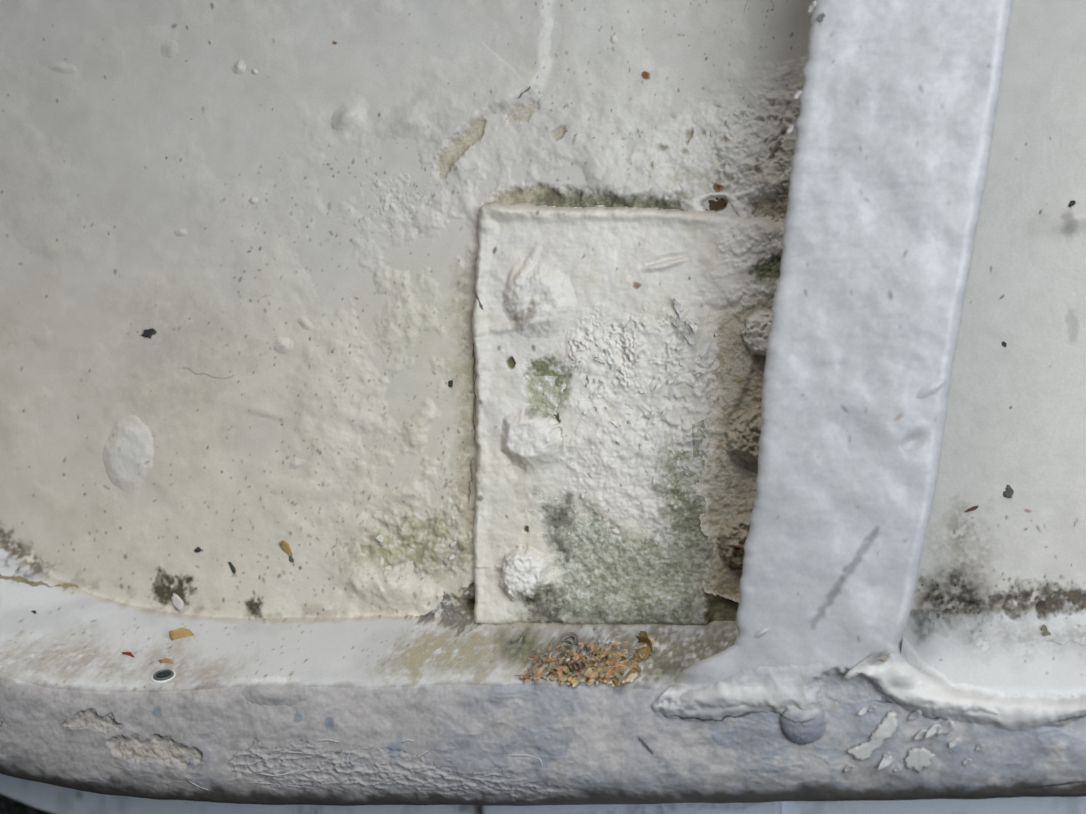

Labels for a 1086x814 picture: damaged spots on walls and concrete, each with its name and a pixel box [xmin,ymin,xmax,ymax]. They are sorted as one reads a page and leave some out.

peeling [807,1,825,22]
spalling [484,63,806,625]
spalling [62,709,202,767]
peeling [651,637,1086,773]
spalling [227,739,576,805]